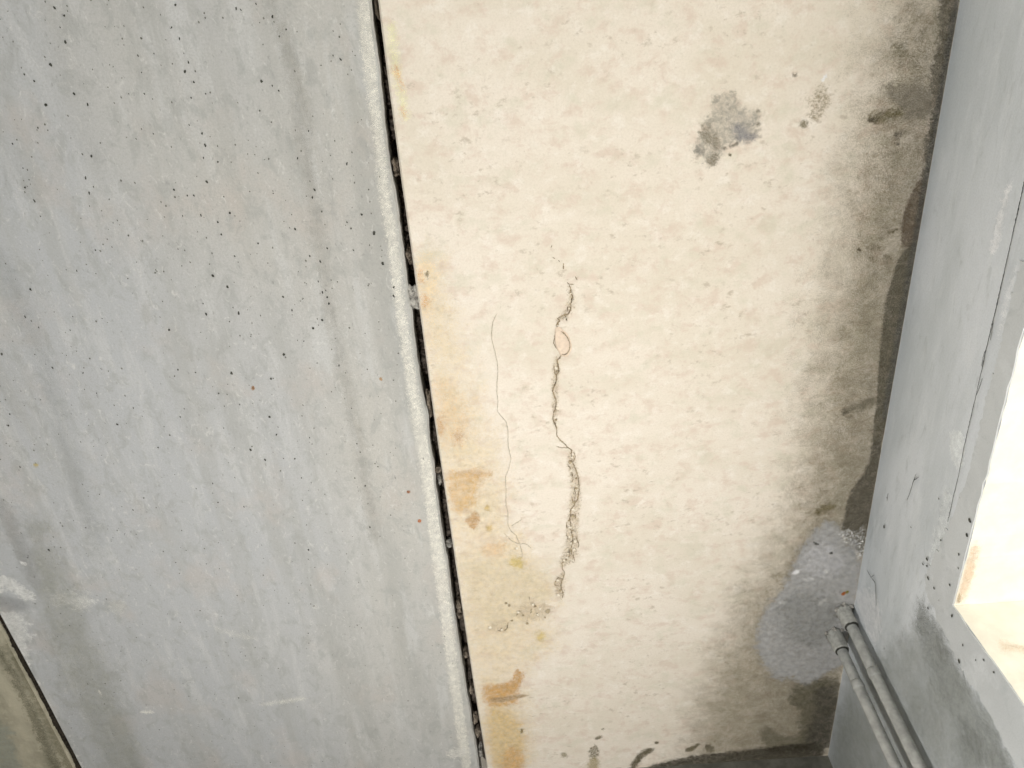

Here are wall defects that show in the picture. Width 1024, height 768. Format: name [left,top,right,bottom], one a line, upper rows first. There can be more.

crack [488,246,583,633]
leakage [629,0,1020,768]
corrosion [480,669,529,708]